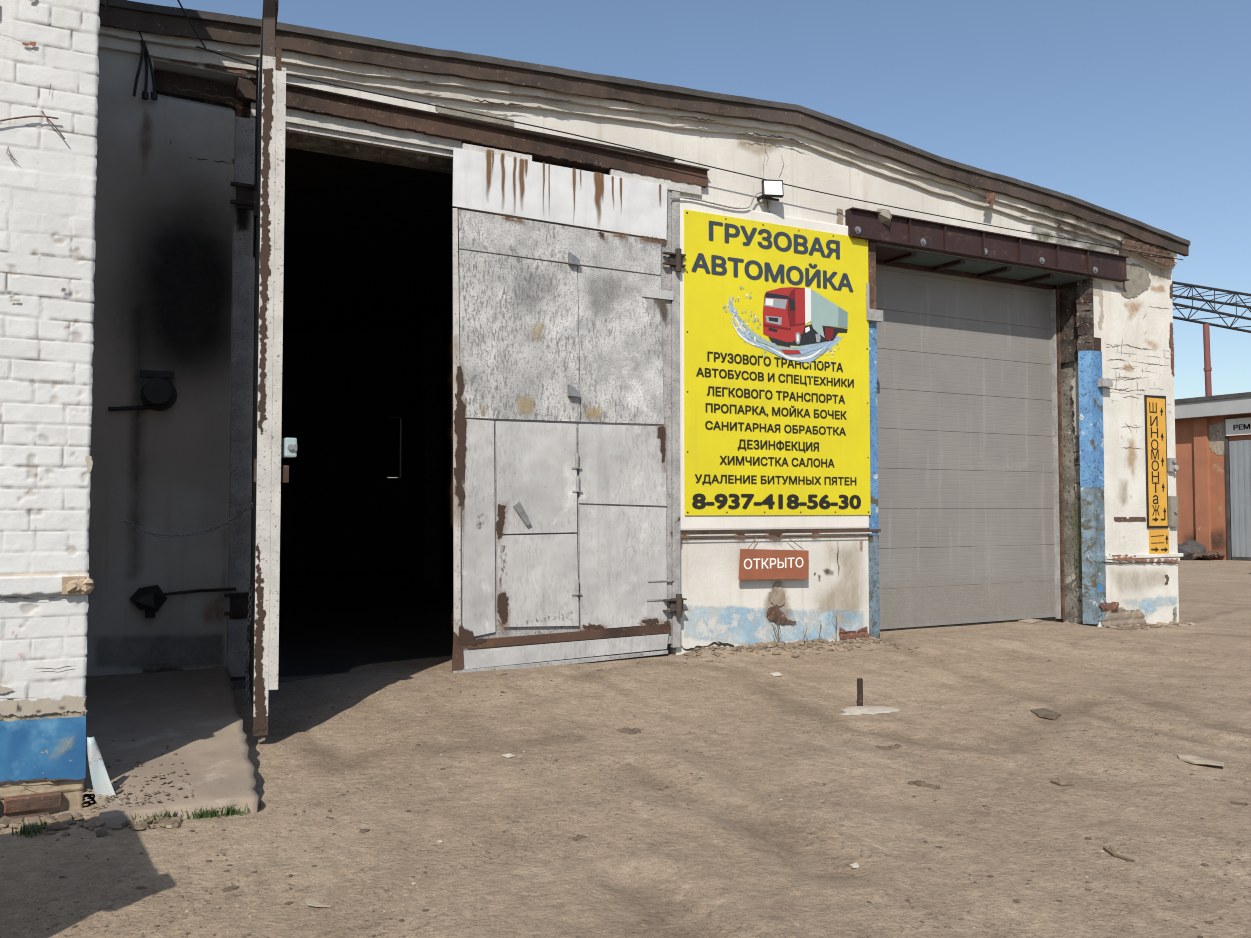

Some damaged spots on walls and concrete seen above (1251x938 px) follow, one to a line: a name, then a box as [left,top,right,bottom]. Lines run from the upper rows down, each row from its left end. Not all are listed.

corrosion [486,149,528,222]
corrosion [573,168,622,216]
corrosion [257,68,274,434]
corrosion [598,232,665,242]
spalling [1122,236,1175,267]
corrosion [453,366,467,506]
corrosion [476,504,572,628]
corrosion [458,625,489,646]
corrosion [641,618,671,627]
spalling [766,582,796,625]
spalling [839,627,869,640]
peeling [0,685,87,718]